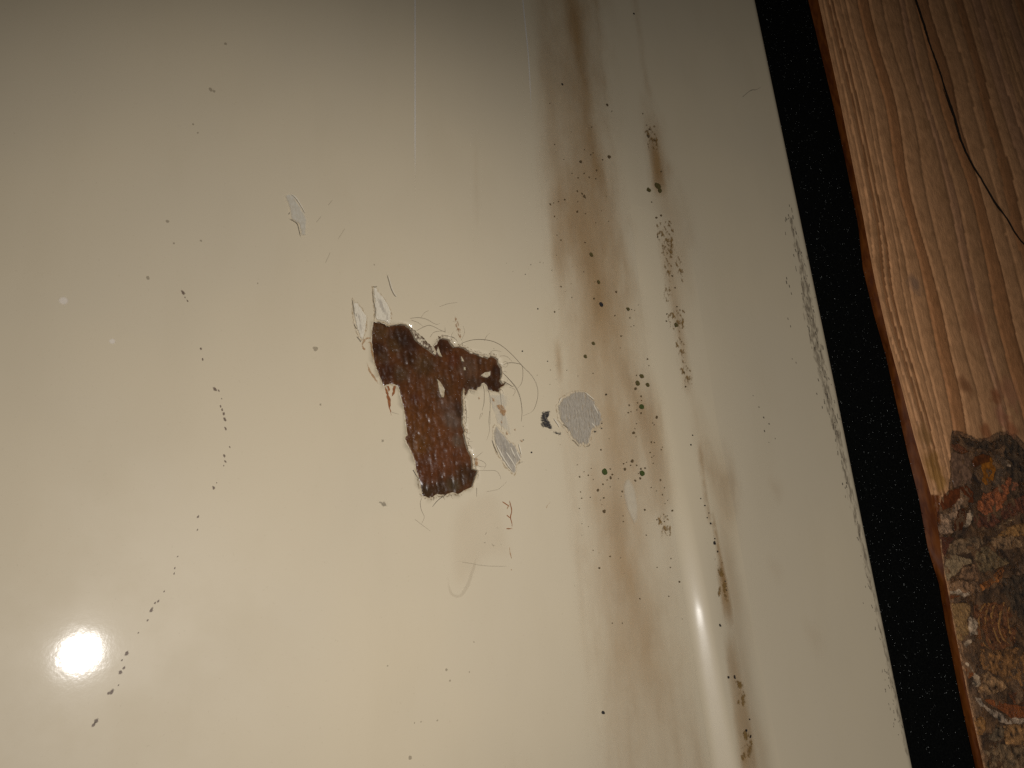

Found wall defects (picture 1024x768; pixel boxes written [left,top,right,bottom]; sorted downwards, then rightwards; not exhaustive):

peeling [351,286,392,342]
leakage [655,215,691,387]
peeling [554,390,603,448]
peeling [492,424,522,476]
leakage [579,441,662,513]